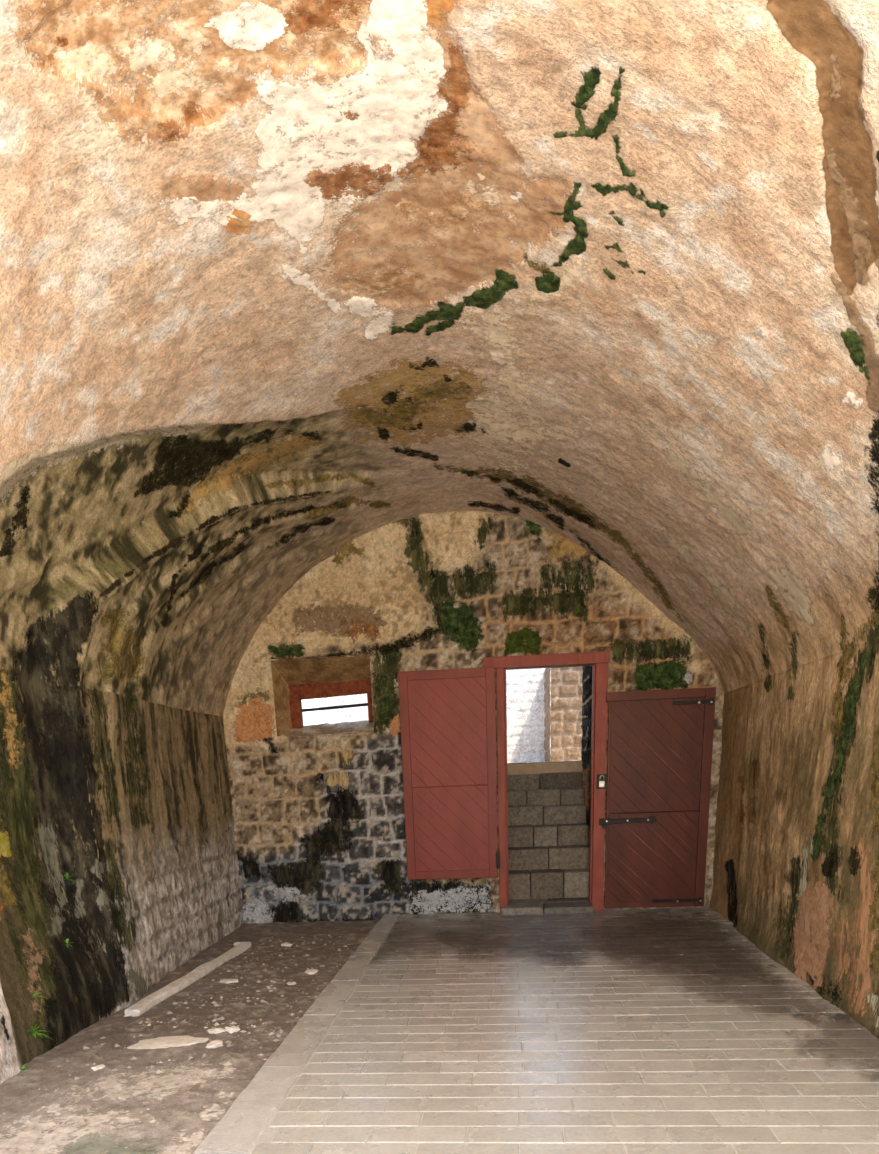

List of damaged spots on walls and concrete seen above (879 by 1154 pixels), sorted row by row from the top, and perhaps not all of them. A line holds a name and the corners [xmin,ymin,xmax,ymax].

spalling [15,0,575,341]
leakage [767,0,879,614]
leakage [0,418,213,505]
leakage [836,614,849,697]
leakage [0,588,155,1051]
leakage [240,750,376,924]
leakage [799,833,814,896]
leakage [804,725,879,1028]